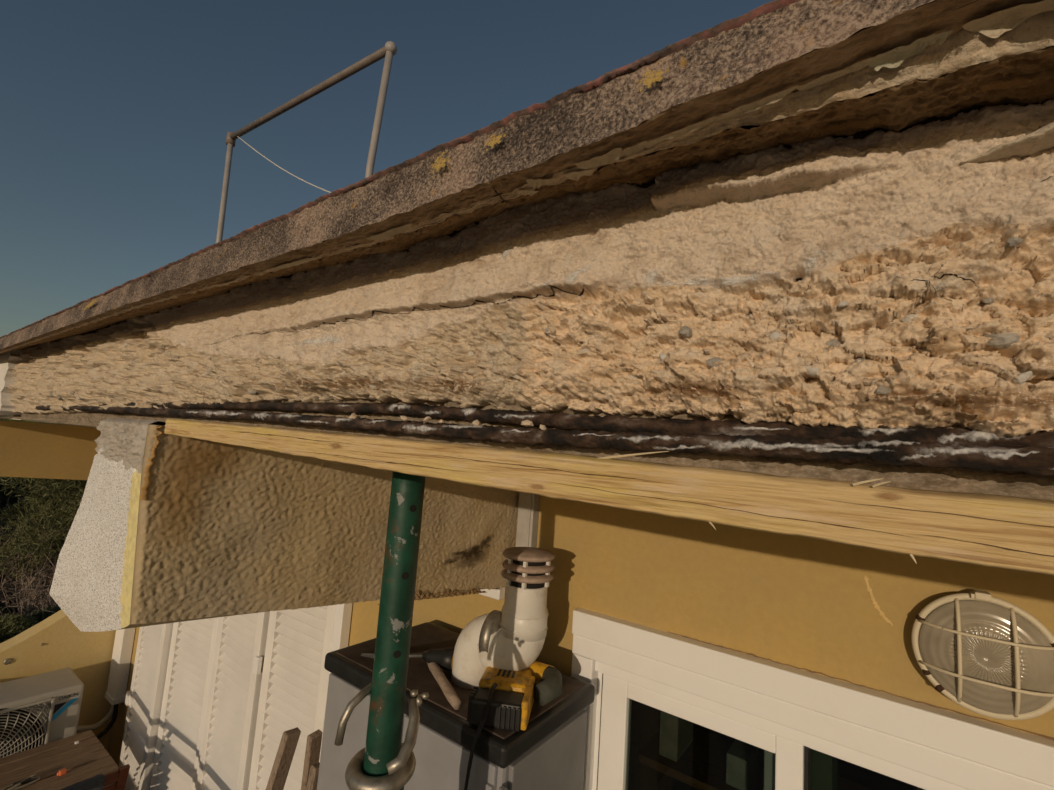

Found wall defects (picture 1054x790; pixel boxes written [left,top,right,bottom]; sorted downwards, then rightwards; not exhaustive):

peeling [517,0,1054,196]
crack [833,68,1054,139]
crack [603,178,655,190]
crack [209,285,588,345]
leakage [188,405,350,423]
leakage [403,411,439,431]
efflorescence [623,436,701,450]
efflorescence [715,427,1036,459]
leakage [449,537,489,563]